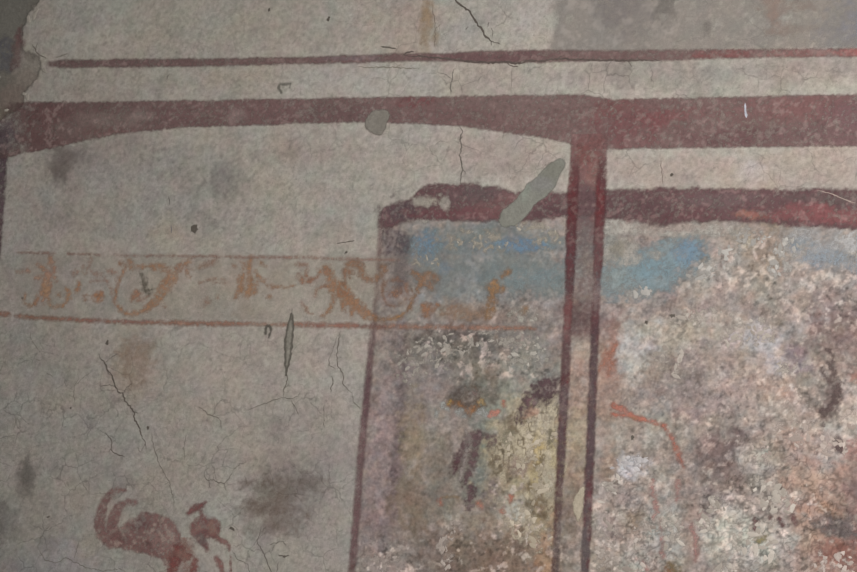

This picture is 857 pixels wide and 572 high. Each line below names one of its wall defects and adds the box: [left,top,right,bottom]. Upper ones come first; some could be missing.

flaking render [0,0,48,120]
crack [358,0,660,92]
crack [458,128,466,183]
crack [73,355,174,500]
crack [249,376,299,415]
spalling [284,313,294,376]
crack [323,333,360,425]
crack [234,527,289,572]